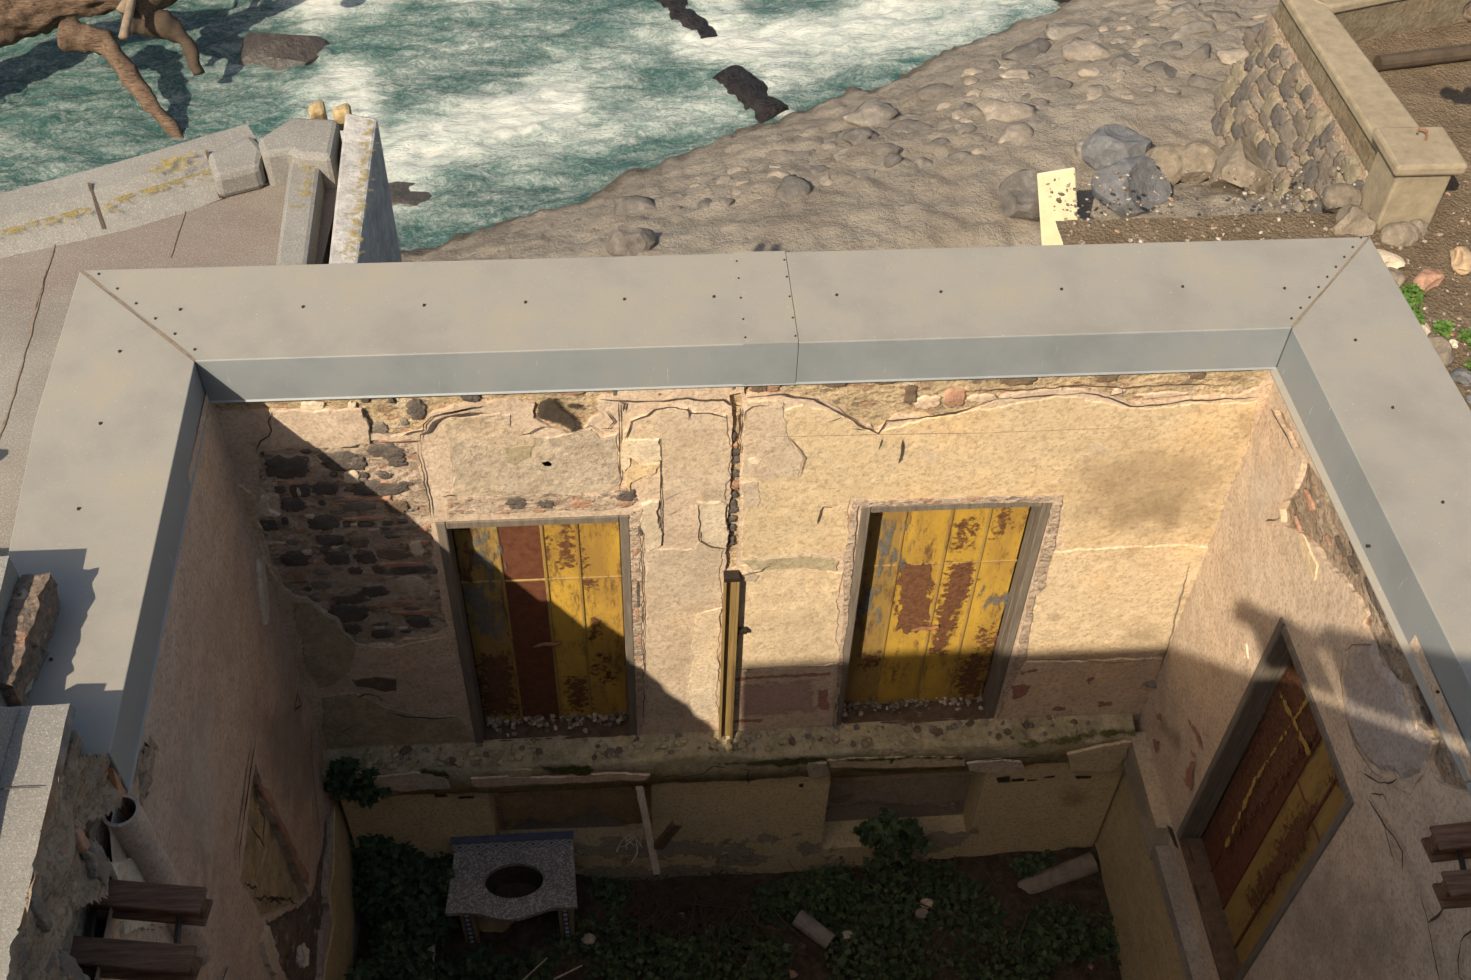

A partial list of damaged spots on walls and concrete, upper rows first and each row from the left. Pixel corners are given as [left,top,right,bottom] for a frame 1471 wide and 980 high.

crack [256,409,272,452]
flaking render [216,370,1266,733]
crack [522,384,1293,724]
spalling [1280,411,1471,795]
flaking render [1067,739,1132,772]
flaking render [373,771,451,792]
flaking render [471,772,650,787]
spalling [6,735,159,980]
flaking render [119,919,168,937]